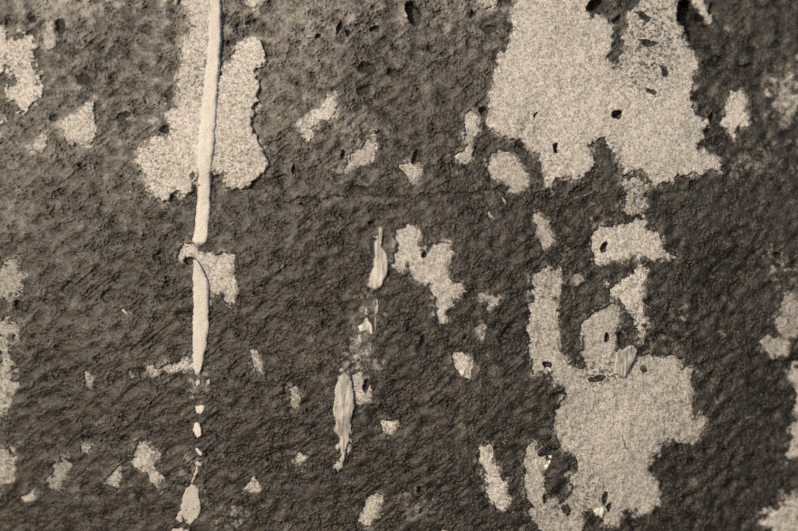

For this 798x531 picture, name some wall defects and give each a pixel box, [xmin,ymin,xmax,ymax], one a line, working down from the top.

peeling [0,16,66,115]
peeling [28,132,48,154]
peeling [135,0,211,202]
peeling [211,36,269,190]
peeling [0,257,26,308]
peeling [177,243,238,306]
peeling [451,0,751,531]
peeling [0,315,21,421]
peeling [332,221,467,472]
peeling [758,289,798,464]
peeling [0,440,17,486]
peeling [758,491,798,531]